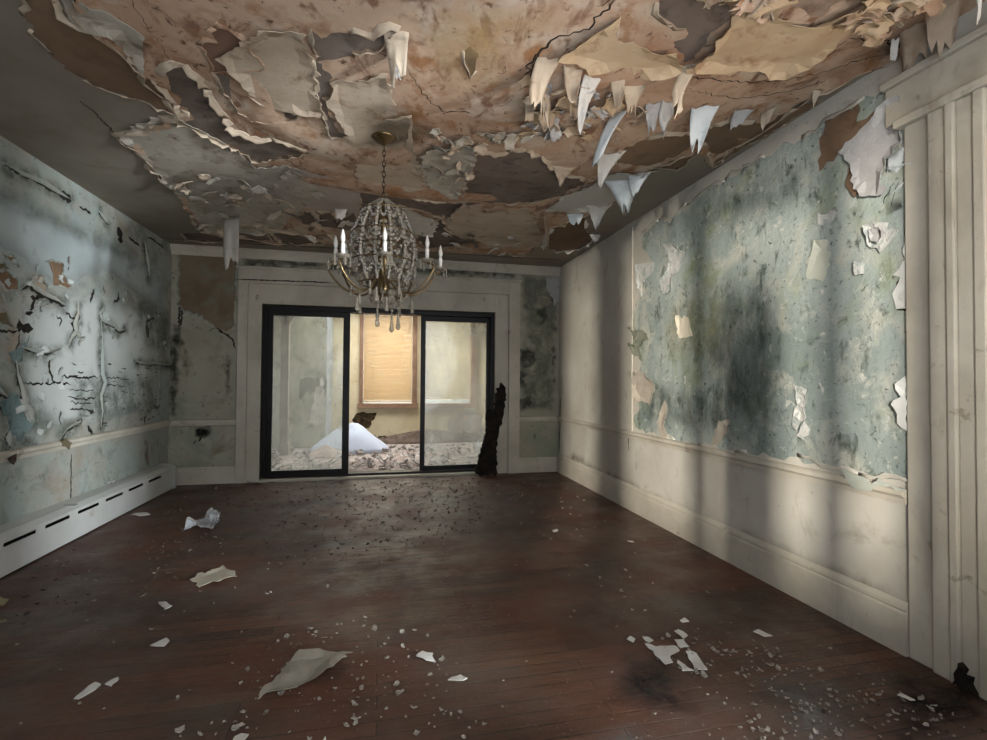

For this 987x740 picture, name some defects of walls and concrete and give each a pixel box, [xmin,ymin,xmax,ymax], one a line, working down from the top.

flaking render [17,0,986,331]
crack [3,161,365,283]
peeling [0,252,75,330]
peeling [675,315,693,338]
peeling [16,345,65,436]
crack [0,277,183,498]
peeling [627,329,668,437]
peeling [711,419,730,445]
peeling [792,383,810,440]
spalling [891,375,907,431]